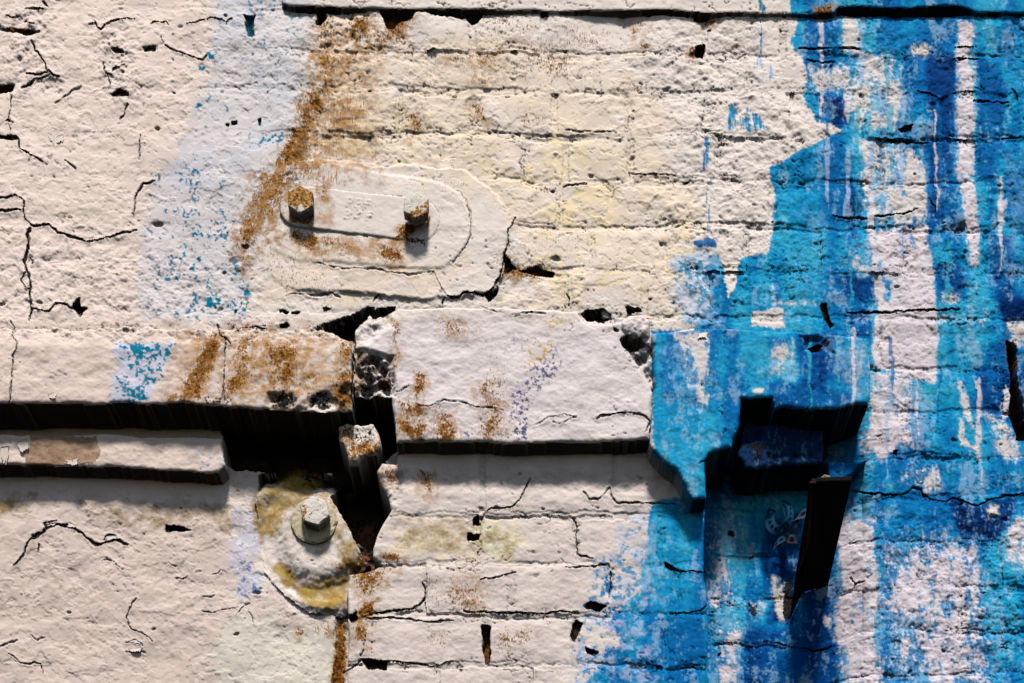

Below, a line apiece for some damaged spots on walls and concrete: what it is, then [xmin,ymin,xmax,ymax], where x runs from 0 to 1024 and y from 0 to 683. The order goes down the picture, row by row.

crack [6,1,80,159]
corrosion [234,11,431,306]
crack [0,180,153,399]
crack [322,219,546,315]
corrosion [168,333,356,411]
peeling [272,390,331,410]
spalling [355,351,395,394]
peeling [1,435,101,466]
crack [14,520,128,566]
leakage [253,476,327,535]
leakage [273,541,357,614]
corrosion [297,520,399,683]